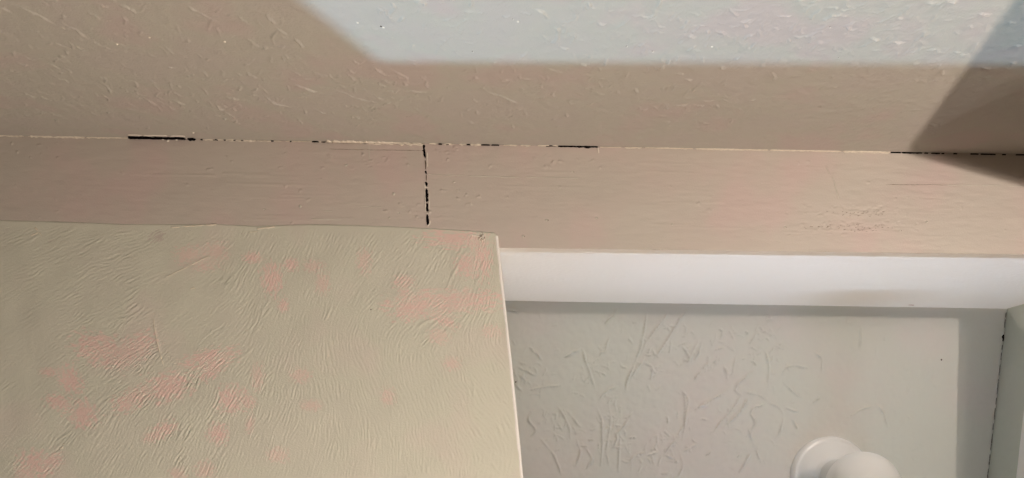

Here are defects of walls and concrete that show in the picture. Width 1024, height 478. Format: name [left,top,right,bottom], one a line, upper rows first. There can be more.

crack [546,142,598,150]
crack [891,150,1024,158]
crack [422,143,499,227]